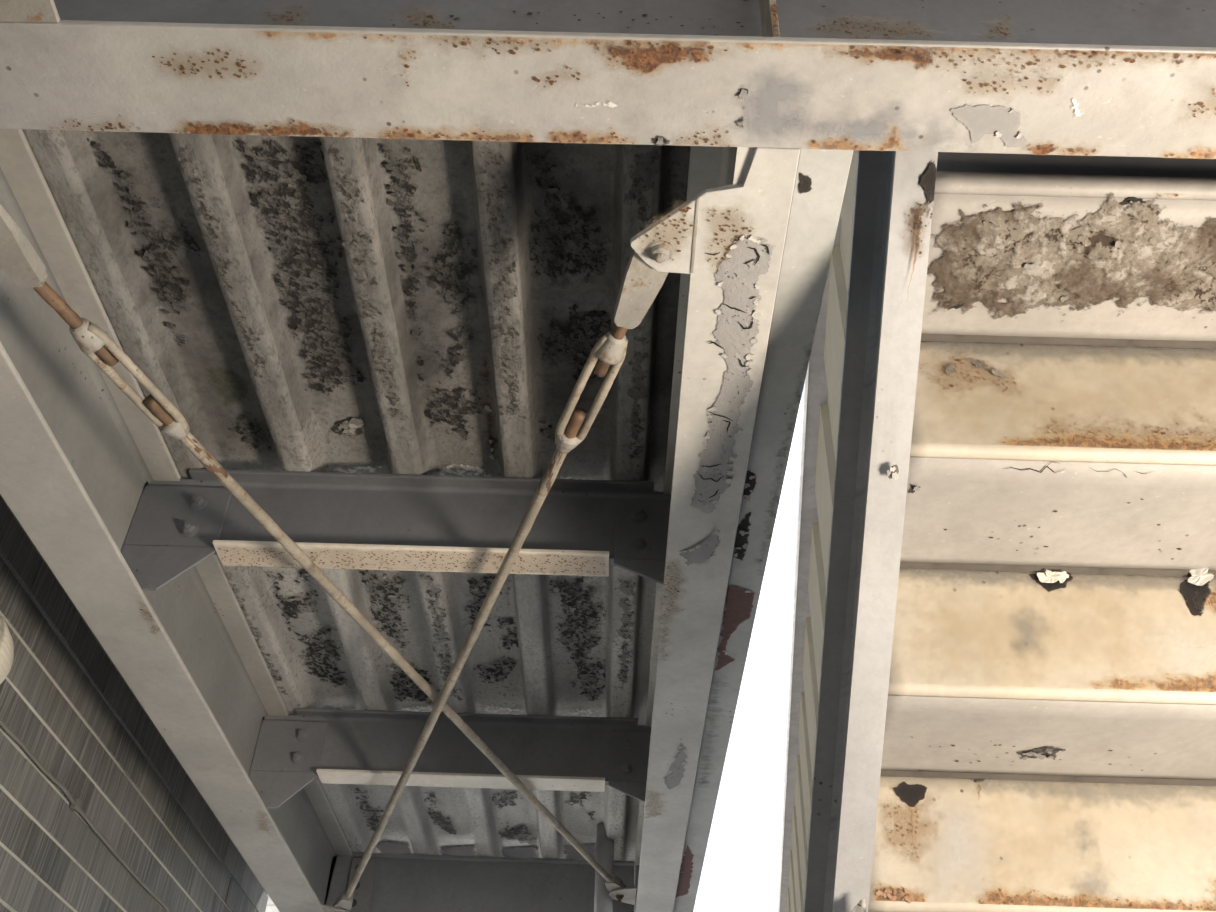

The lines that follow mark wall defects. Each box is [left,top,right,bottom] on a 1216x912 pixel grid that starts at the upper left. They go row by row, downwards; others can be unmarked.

corrosion [407,9,754,75]
corrosion [817,17,1216,94]
spalling [927,193,1216,319]
peeling [690,235,776,513]
corrosion [1001,417,1216,451]
peeling [1037,570,1069,583]
peeling [1188,567,1214,586]
peeling [715,586,755,670]
corrosion [1095,673,1216,692]
leakage [481,703,521,715]
leakage [566,706,599,717]
corrosion [979,880,1216,911]